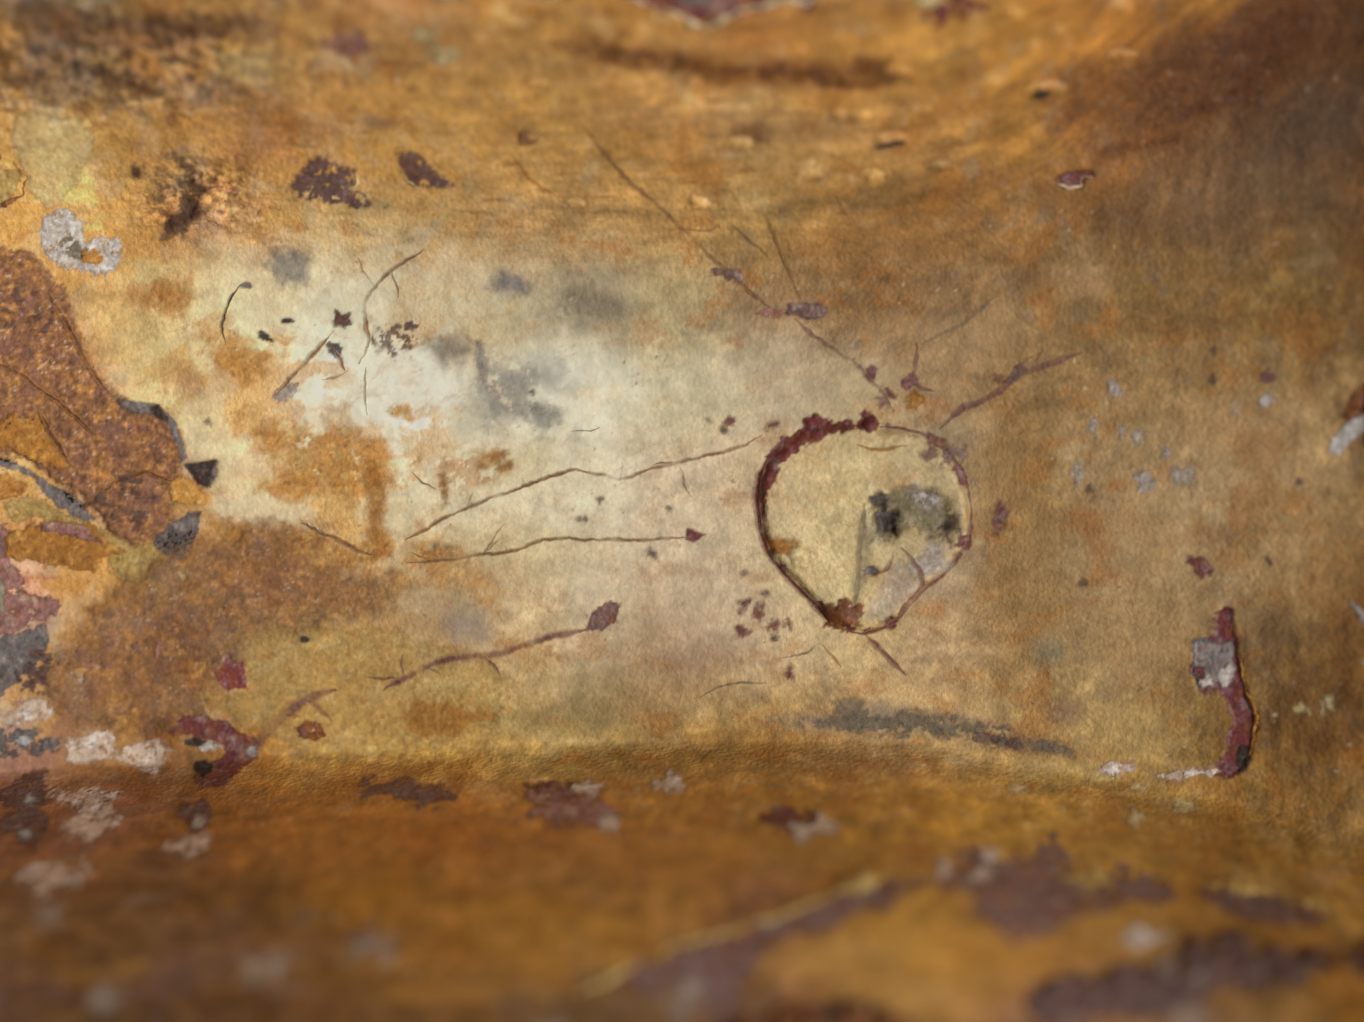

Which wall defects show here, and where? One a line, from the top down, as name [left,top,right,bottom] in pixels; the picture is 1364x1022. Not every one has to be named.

peeling [634,0,814,31]
corrosion [0,247,219,574]
damp [326,342,342,357]
damp [334,310,352,327]
damp [372,321,419,357]
crack [866,343,1083,429]
corrosion [255,422,391,558]
crack [406,439,755,563]
peeling [0,523,61,635]
corrosion [0,522,395,775]
crack [369,601,620,691]
peeling [1098,607,1259,813]